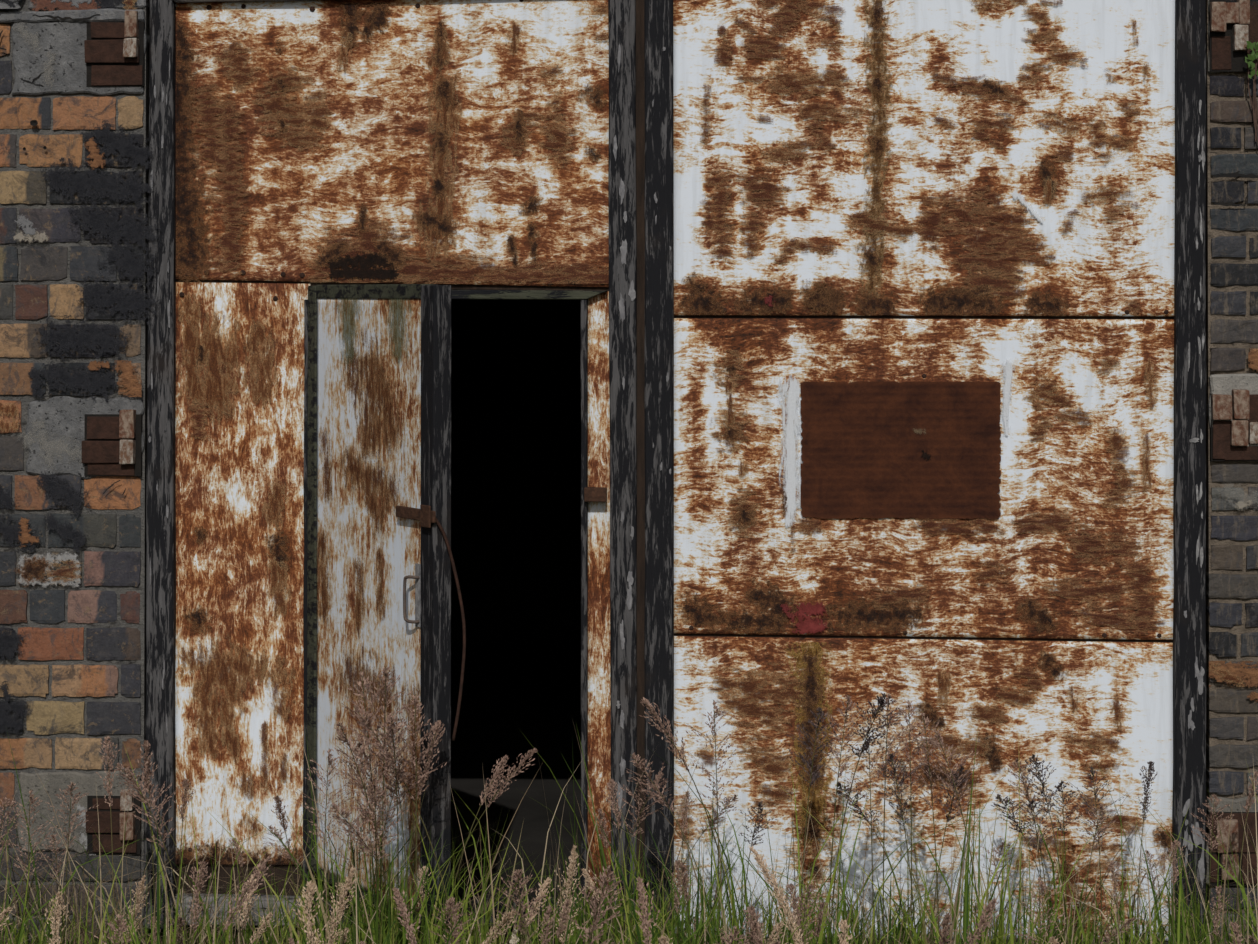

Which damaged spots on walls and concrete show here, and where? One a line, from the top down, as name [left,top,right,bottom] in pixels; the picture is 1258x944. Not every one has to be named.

rust [176,19,333,439]
rust [394,20,609,284]
rust [678,0,1140,315]
rust [178,604,295,833]
rust [176,840,303,865]
rust [319,326,420,894]
rust [711,349,762,538]
rust [710,642,832,880]
rust [781,374,1165,635]
rust [913,650,1078,796]
rust [1021,793,1143,897]
rust [1066,698,1124,774]